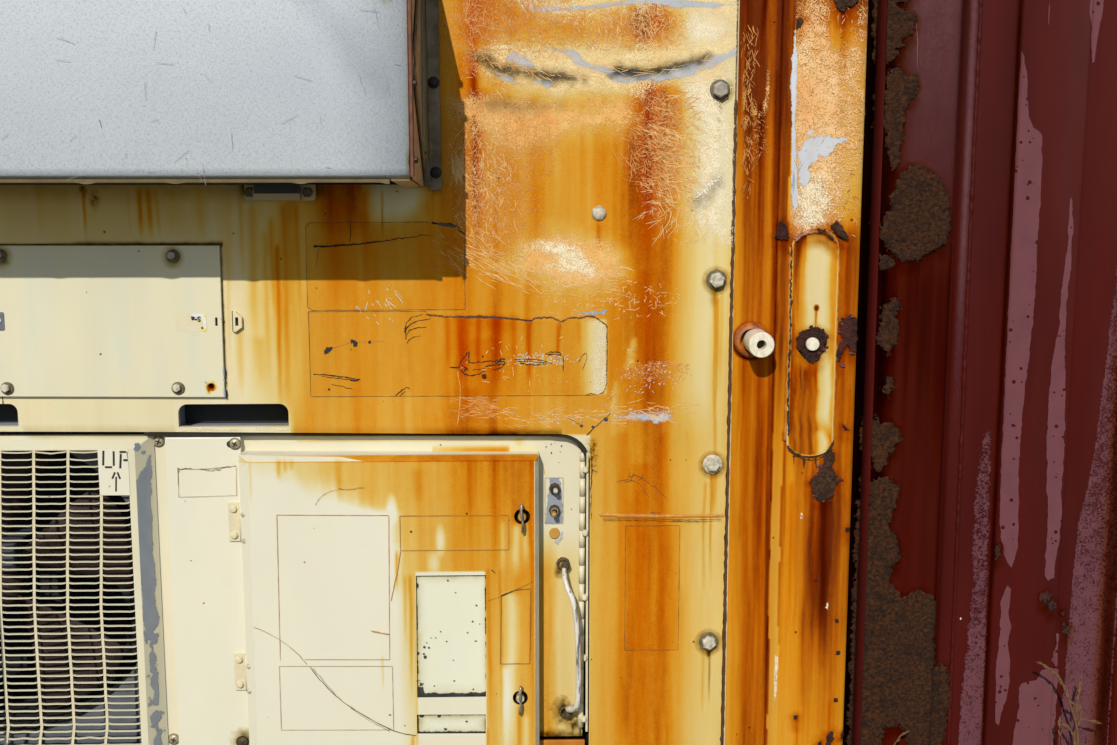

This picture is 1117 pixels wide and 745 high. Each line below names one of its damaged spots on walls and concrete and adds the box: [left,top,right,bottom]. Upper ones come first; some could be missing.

corrosion [322,185,361,231]
corrosion [459,57,476,273]
peeling [133,443,165,745]
corrosion [400,454,538,521]
corrosion [446,275,502,434]
corrosion [613,89,678,745]
corrosion [731,0,952,745]